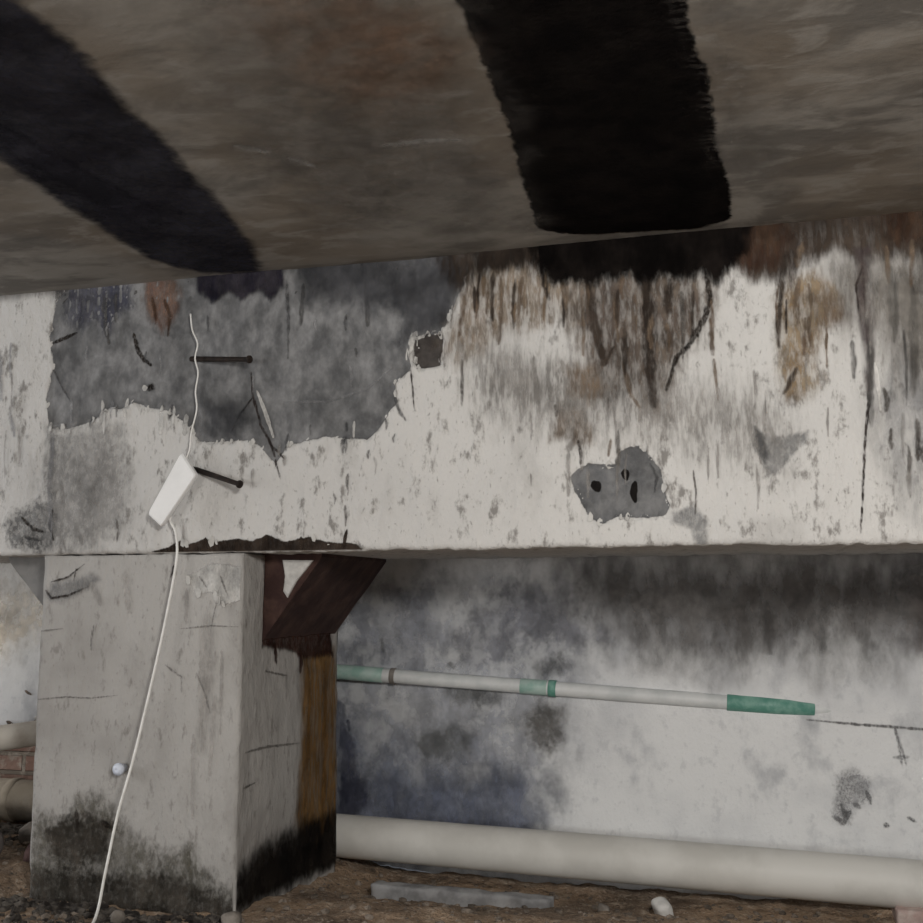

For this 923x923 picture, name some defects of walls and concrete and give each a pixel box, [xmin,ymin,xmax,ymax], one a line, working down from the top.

leakage [0,0,283,303]
leakage [456,0,751,286]
flaking render [46,254,467,462]
leakage [491,362,773,485]
flaking render [571,441,706,545]
leakage [867,343,890,411]
leakage [839,252,923,391]
leakage [907,395,923,482]
leakage [338,583,576,680]
flaking render [0,746,36,780]
leakage [29,681,563,915]
leakage [834,775,871,824]